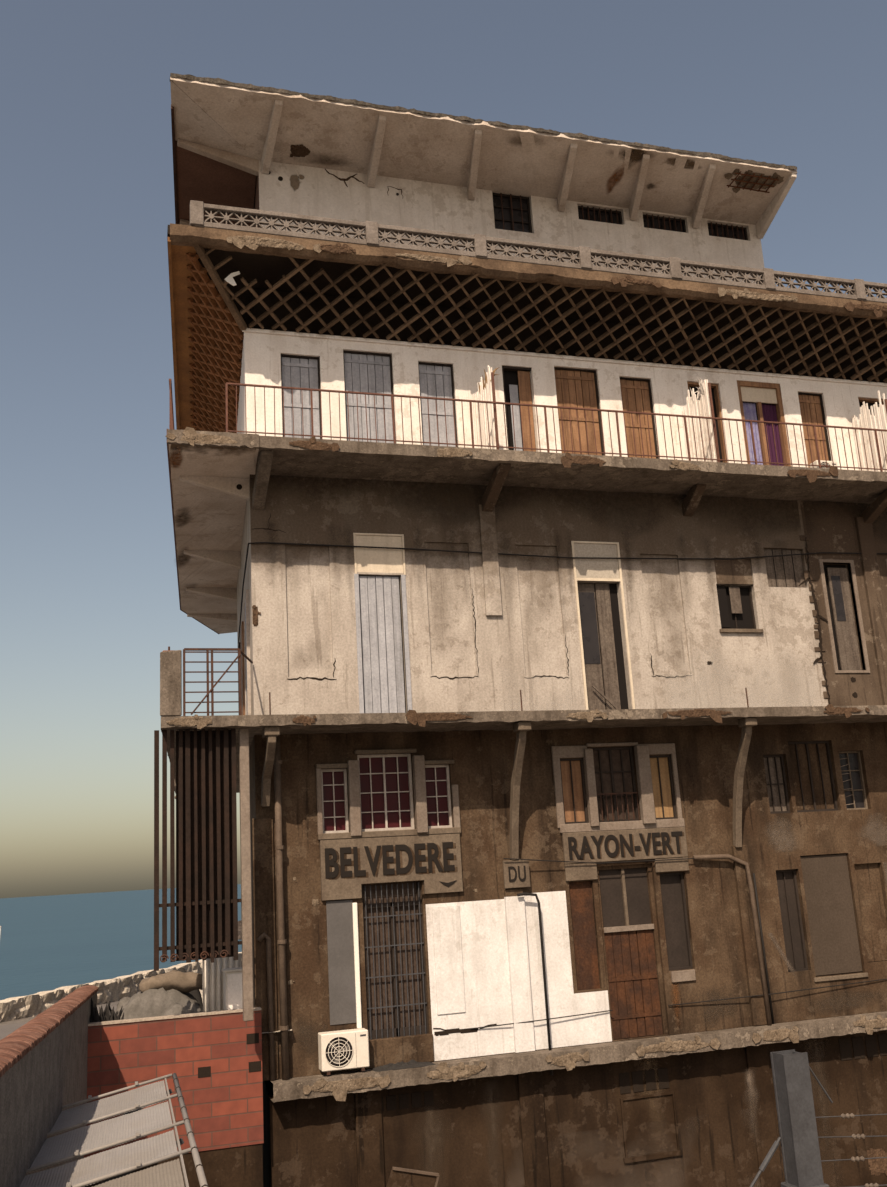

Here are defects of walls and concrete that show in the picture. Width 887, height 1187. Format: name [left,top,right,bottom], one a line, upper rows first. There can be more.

spalling [290,144,310,157]
peeling [290,175,304,190]
crack [325,169,403,196]
spalling [724,169,784,193]
crack [431,590,479,680]
crack [524,635,569,679]
crack [288,659,337,681]
crack [433,1024,497,1036]